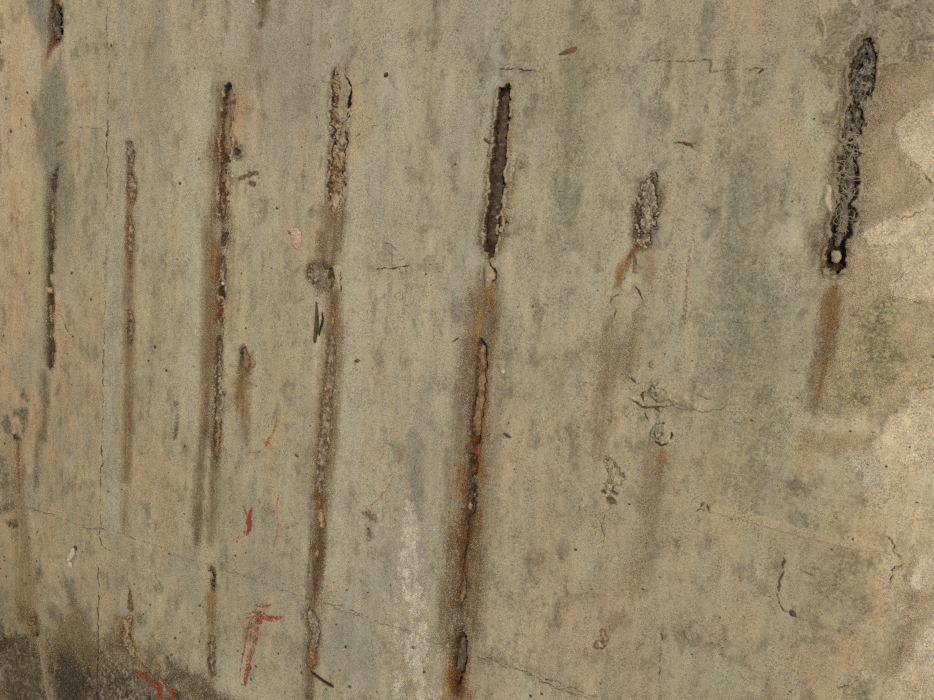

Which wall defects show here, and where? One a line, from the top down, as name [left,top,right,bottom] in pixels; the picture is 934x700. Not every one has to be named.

spalling [221,83,242,171]
spalling [327,69,349,216]
spalling [483,83,512,259]
spalling [825,140,860,274]
spalling [842,38,878,135]
peeling [863,97,934,304]
crack [0,0,598,700]
corrosion [307,288,341,699]
corrosion [442,275,501,700]
corrosion [808,214,859,409]
peeling [848,386,934,486]
water stain [0,592,225,700]